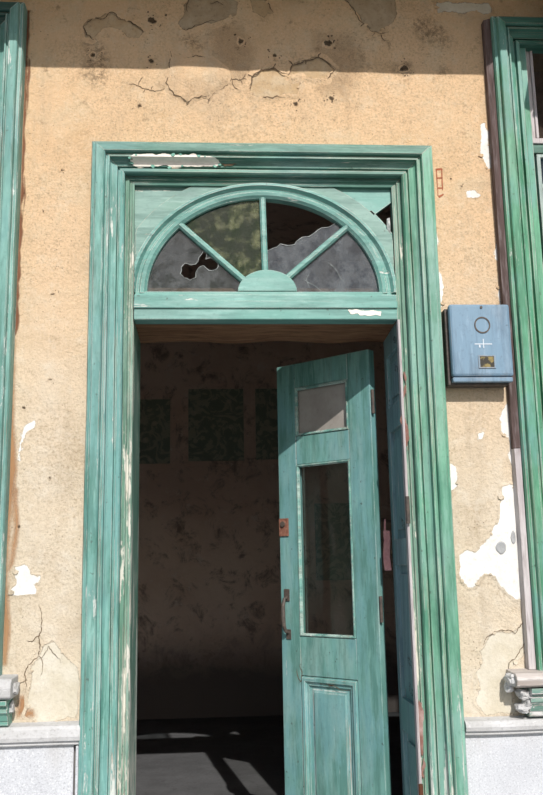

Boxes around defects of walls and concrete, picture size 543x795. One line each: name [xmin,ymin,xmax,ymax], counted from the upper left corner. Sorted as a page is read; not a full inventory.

flaking render [77,0,279,61]
flaking render [243,35,340,111]
peeling [128,153,235,169]
peeling [477,121,491,172]
peeling [16,419,37,463]
peeling [455,401,521,603]
peeling [8,562,43,598]
crack [20,607,43,686]